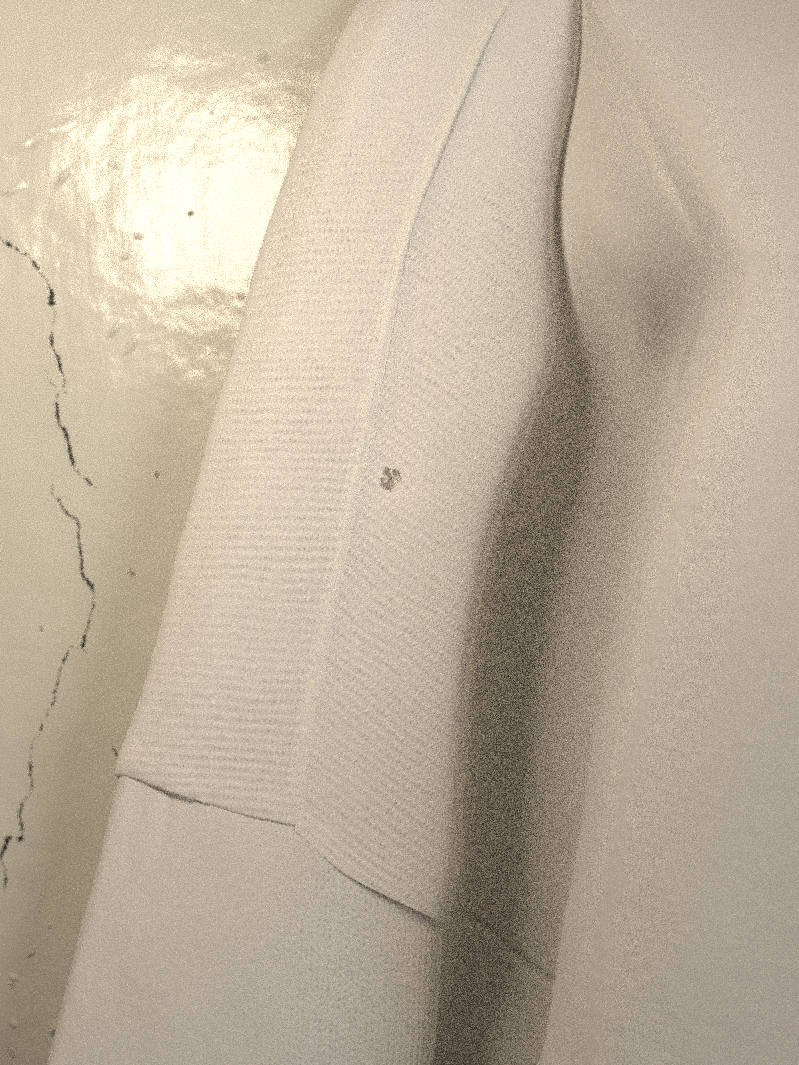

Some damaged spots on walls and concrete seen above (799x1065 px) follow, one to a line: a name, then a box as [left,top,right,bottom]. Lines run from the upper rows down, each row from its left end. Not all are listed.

crack [0,240,95,891]